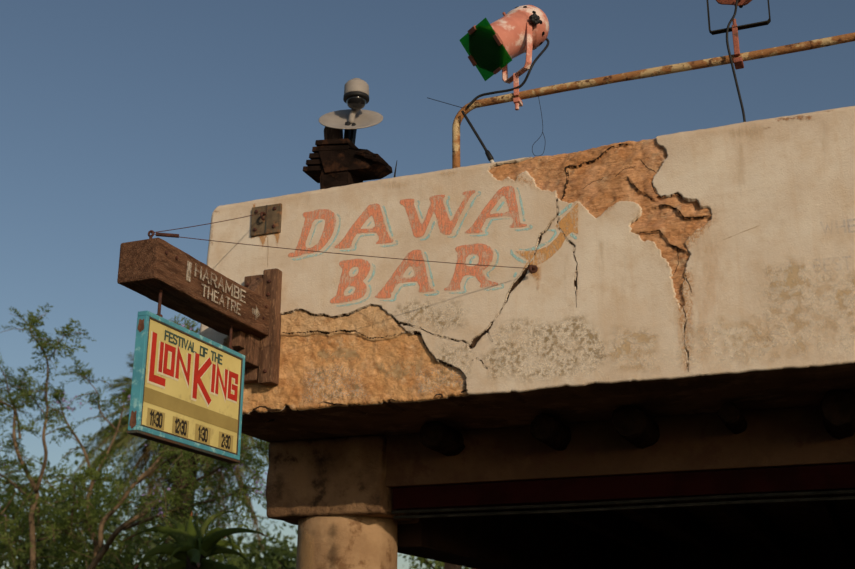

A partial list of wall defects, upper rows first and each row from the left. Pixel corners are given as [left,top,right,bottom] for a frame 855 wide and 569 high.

flaking render [242,306,468,414]
crack [281,200,578,398]
flaking render [489,138,712,307]
crack [679,274,692,372]